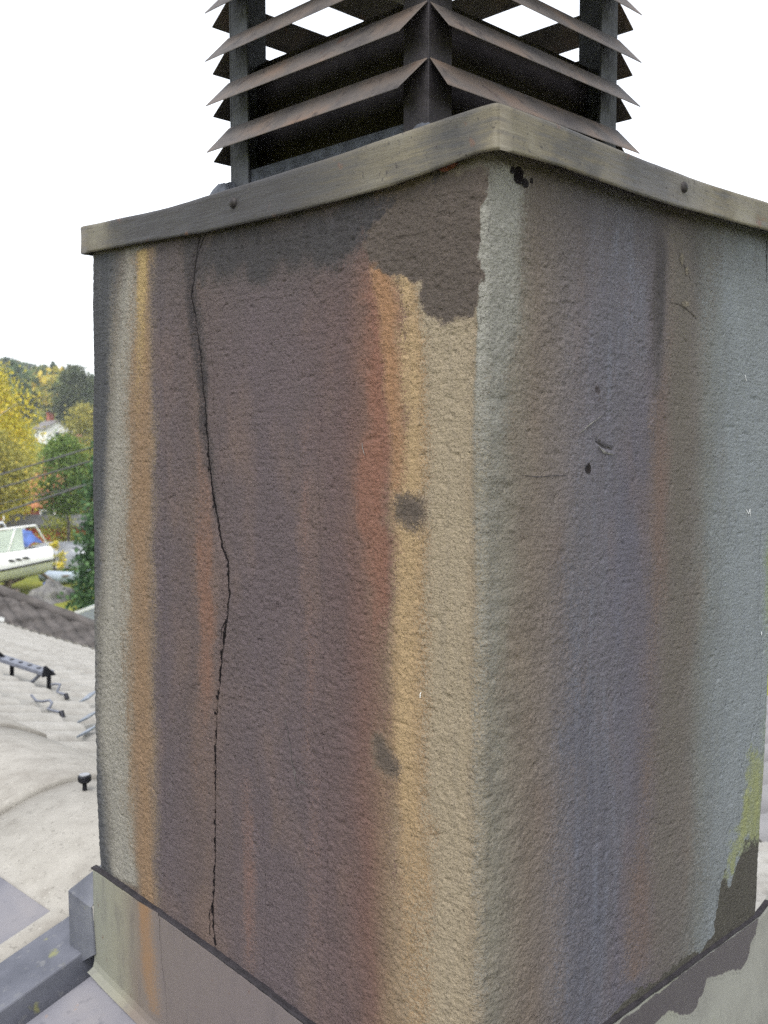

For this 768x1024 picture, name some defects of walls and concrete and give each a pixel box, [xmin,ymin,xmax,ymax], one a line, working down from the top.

corrosion [108,242,167,1024]
crack [191,233,230,945]
leakage [359,154,537,1024]
leakage [609,208,768,1024]